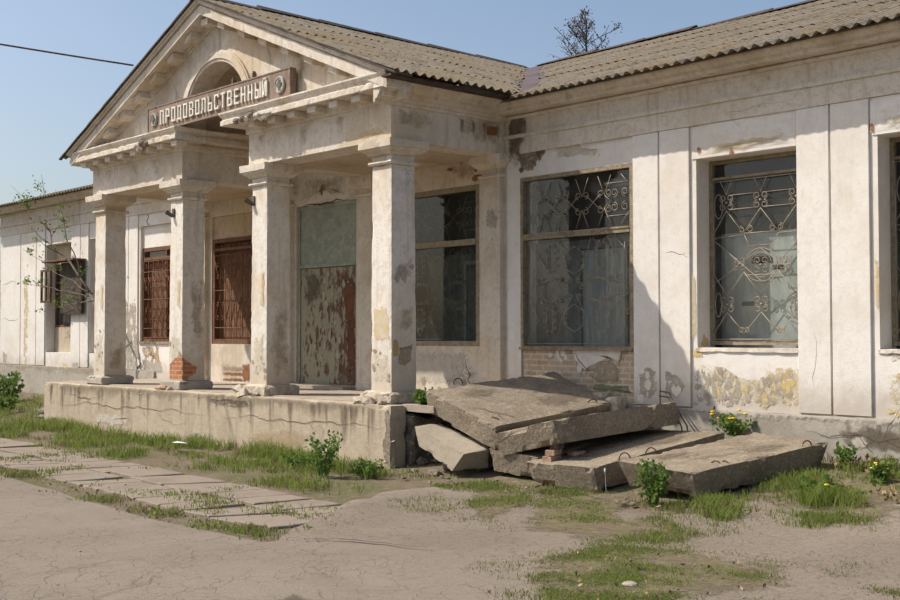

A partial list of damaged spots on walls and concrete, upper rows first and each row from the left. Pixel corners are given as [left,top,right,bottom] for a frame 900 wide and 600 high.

peeling [126,299,197,380]
corrosion [305,275,331,304]
corrosion [324,273,356,373]
peeling [626,276,900,425]
crack [56,394,205,425]
crack [236,415,384,449]